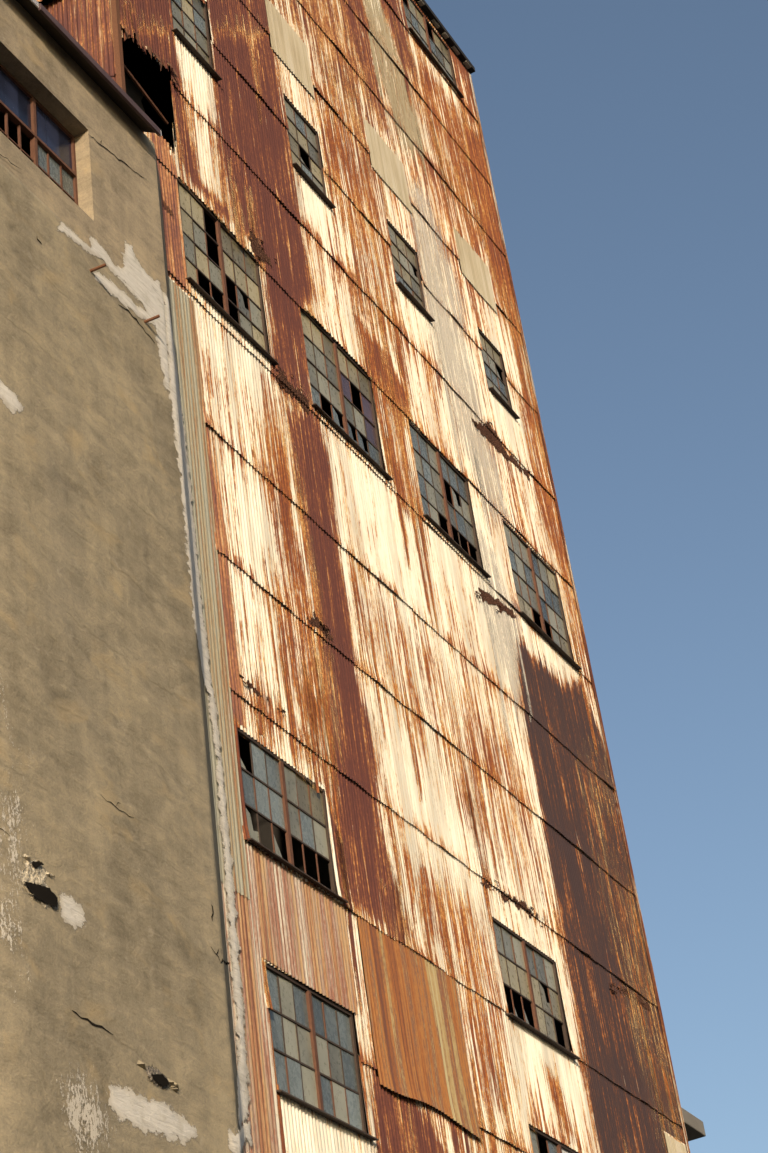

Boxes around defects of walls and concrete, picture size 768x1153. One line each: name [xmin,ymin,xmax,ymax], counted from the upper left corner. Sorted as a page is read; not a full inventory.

peeling [128,28,179,84]
corrosion [119,0,686,1153]
spalling [20,854,58,909]
spalling [137,1060,179,1093]